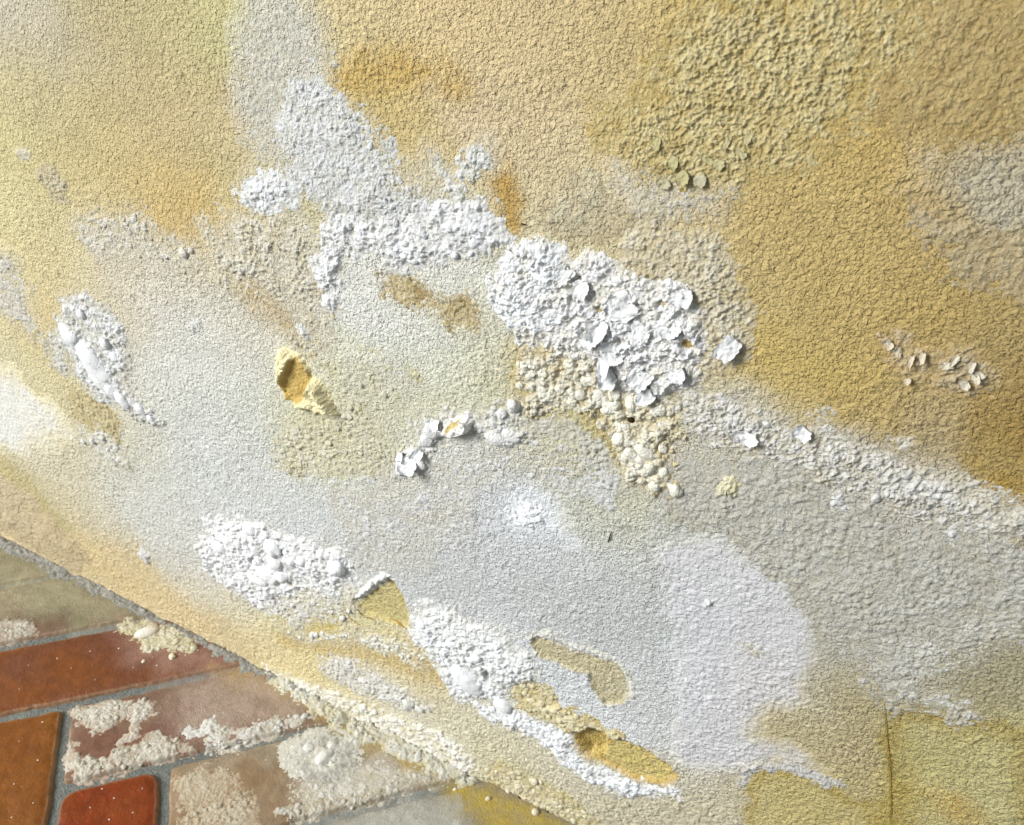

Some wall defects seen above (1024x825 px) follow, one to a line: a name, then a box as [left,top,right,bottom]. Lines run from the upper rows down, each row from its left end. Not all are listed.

water stain [212,0,575,396]
peeling [484,234,742,422]
peeling [872,325,1013,400]
peeling [395,448,424,477]
peeling [428,415,475,438]
flaking render [353,571,410,629]
flaking render [524,628,640,708]
water stain [61,610,574,825]
flaking render [472,680,754,825]